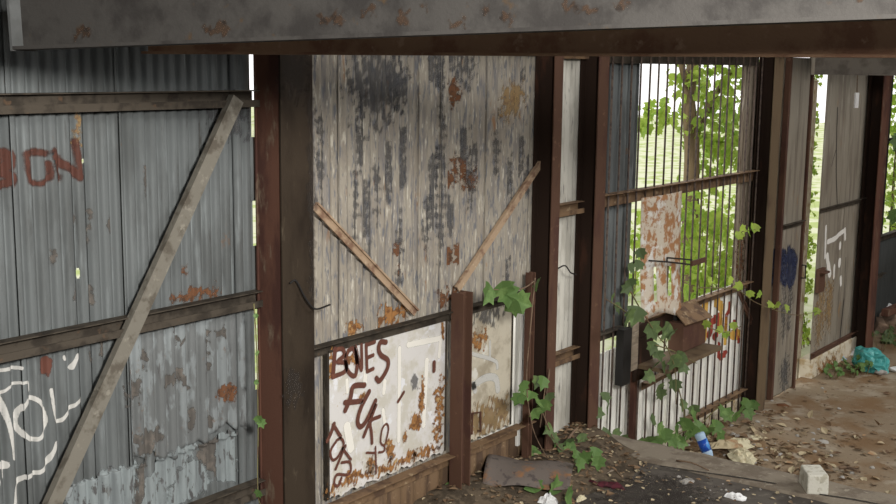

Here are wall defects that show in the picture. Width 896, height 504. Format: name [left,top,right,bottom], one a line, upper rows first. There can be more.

water stain [353,97,407,269]
water stain [421,62,478,266]
water stain [493,111,529,199]
water stain [395,209,405,285]
corrosion [640,191,682,323]
peeling [63,415,239,504]
peeling [164,367,190,390]
peeling [188,407,196,433]
peeling [206,324,226,370]
corrosion [325,373,445,497]
corrosion [377,303,408,328]
corrosion [471,393,509,436]